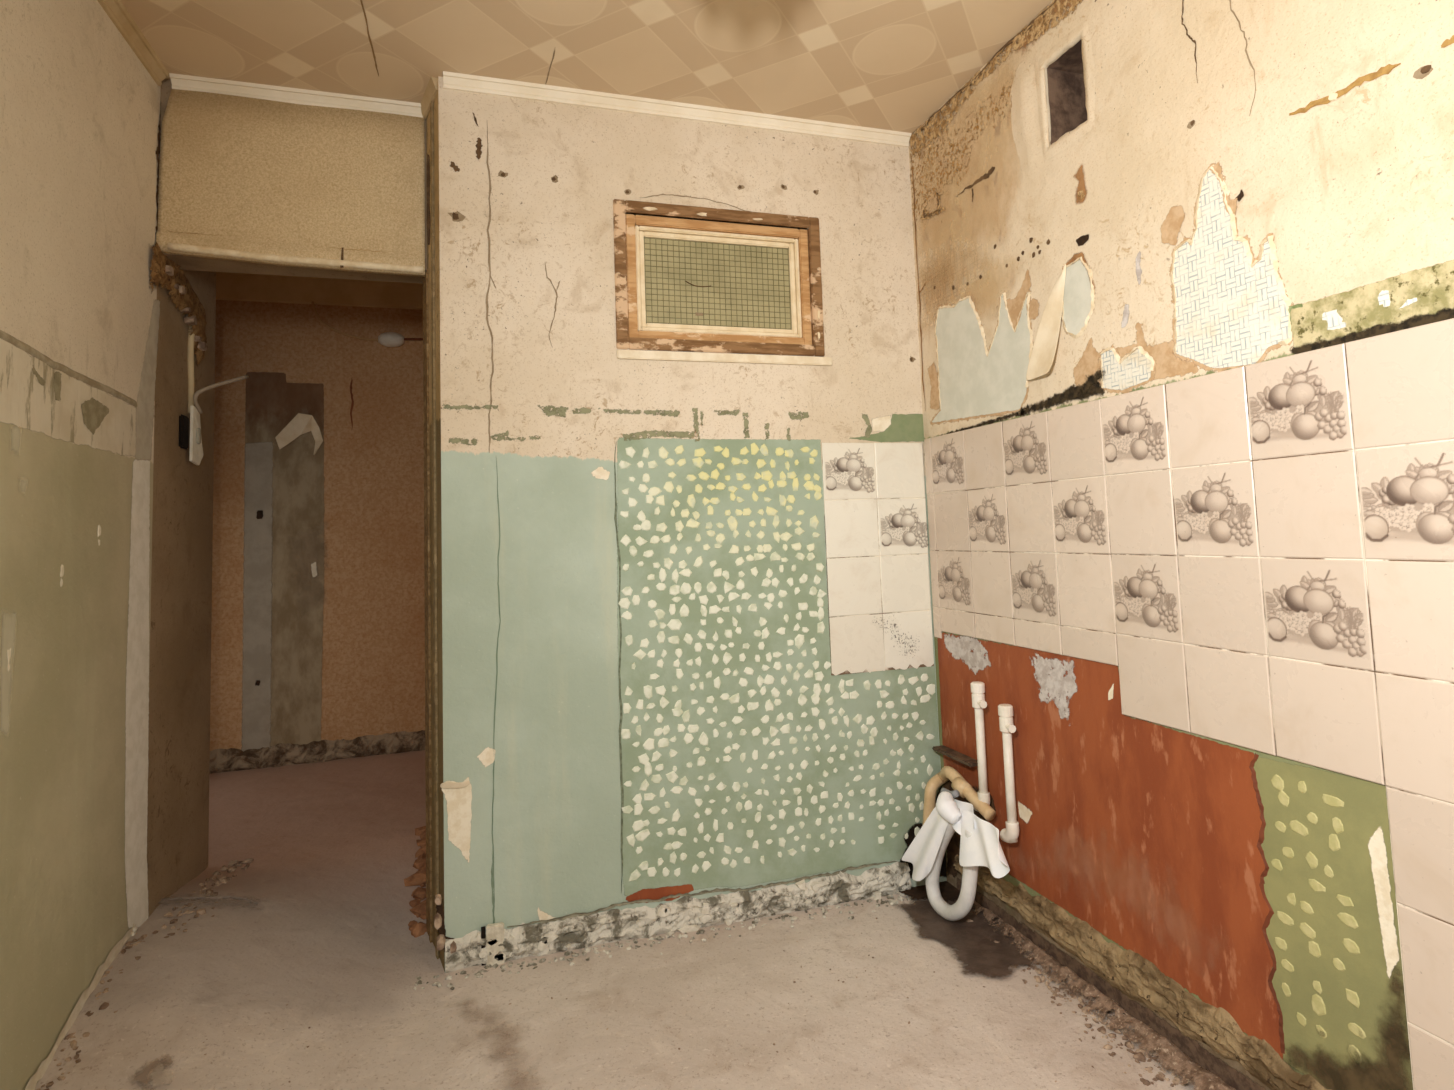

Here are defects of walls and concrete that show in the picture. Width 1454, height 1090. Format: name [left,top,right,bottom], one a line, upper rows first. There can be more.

spalling [910,0,1096,220]
crack [1181,0,1198,83]
crack [1229,0,1256,116]
peeling [910,237,1050,426]
peeling [1062,163,1293,394]
flaking render [0,242,208,1090]
flaking render [242,372,325,752]
crack [426,113,501,924]
flaking render [1030,653,1077,719]
flaking render [434,823,923,973]
damp [899,881,1032,978]
flaking render [936,753,1331,1090]